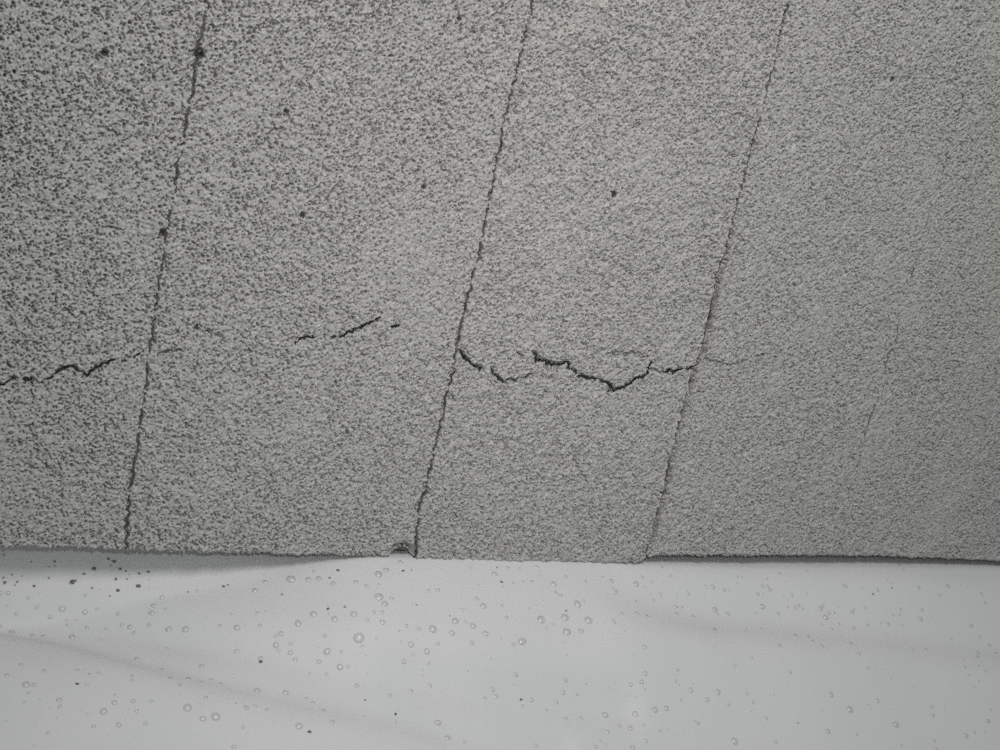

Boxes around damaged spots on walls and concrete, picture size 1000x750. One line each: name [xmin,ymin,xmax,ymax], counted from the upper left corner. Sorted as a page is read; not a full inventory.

crack [0,0,209,549]
crack [294,316,399,344]
crack [413,0,789,559]